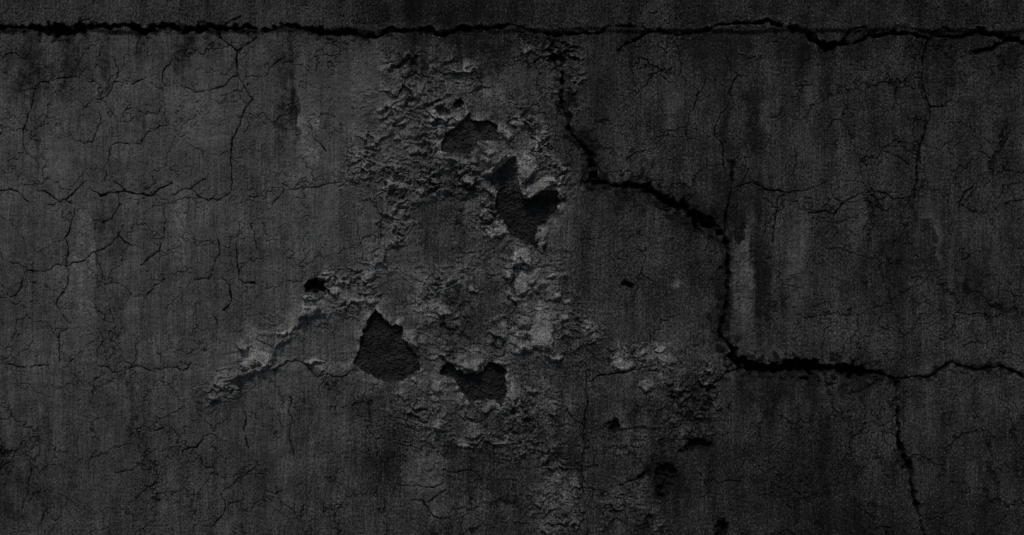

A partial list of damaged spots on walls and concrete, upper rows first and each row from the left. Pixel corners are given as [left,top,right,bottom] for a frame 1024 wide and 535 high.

spalling [396,95,566,258]
crack [0,16,1024,394]
flaking render [206,278,335,403]
spalling [347,303,572,414]
flaking render [500,254,573,303]
crack [211,417,256,529]
crack [566,364,656,494]
hole [652,436,714,502]
crack [882,408,926,535]